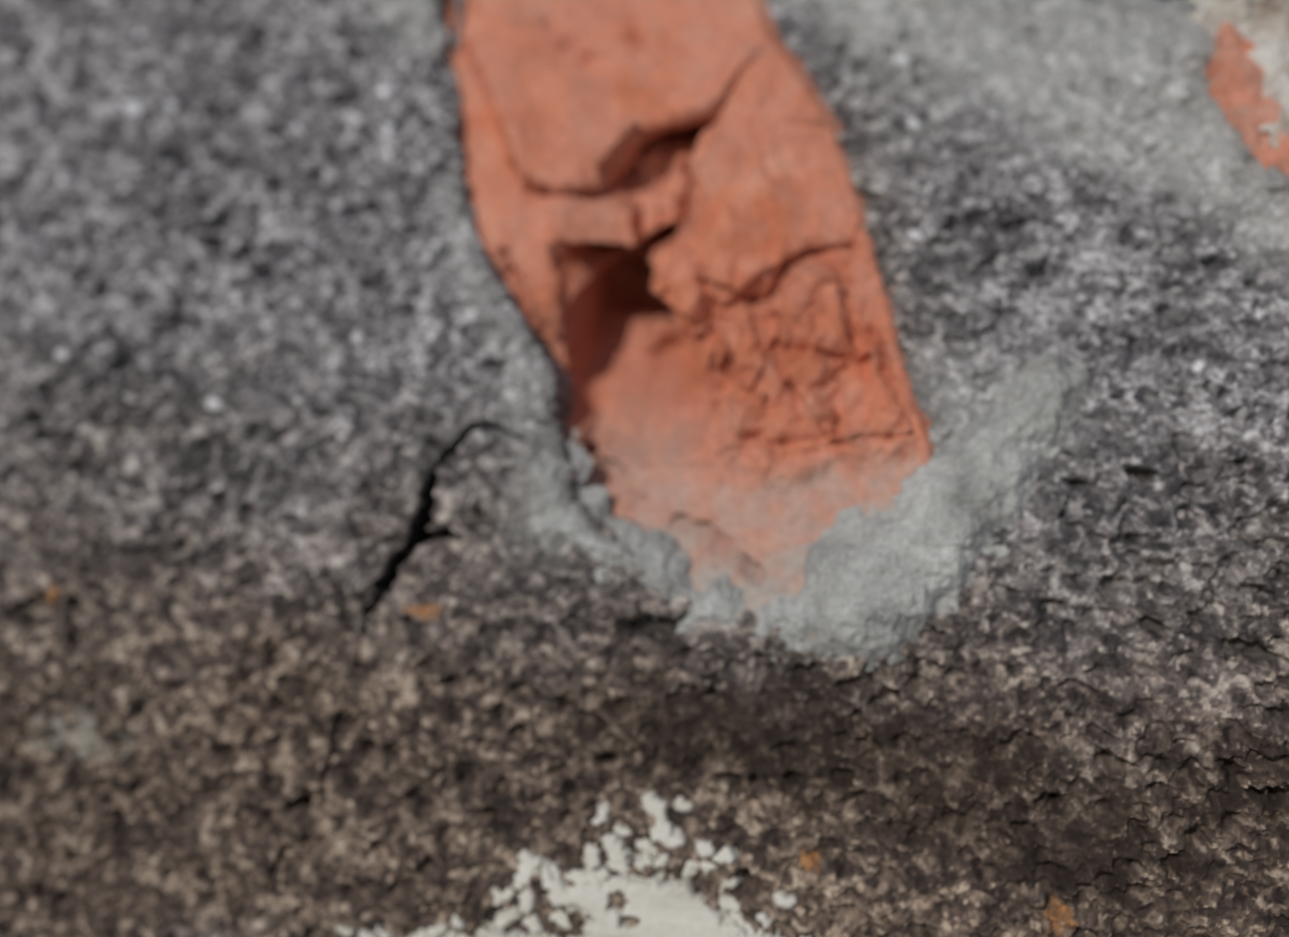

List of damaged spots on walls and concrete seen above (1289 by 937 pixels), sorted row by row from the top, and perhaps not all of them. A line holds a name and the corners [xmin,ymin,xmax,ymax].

spalling [1183,0,1289,175]
spalling [447,0,1089,672]
crack [361,423,527,638]
crack [271,842,297,876]
crack [320,708,346,792]
water stain [1217,732,1289,816]